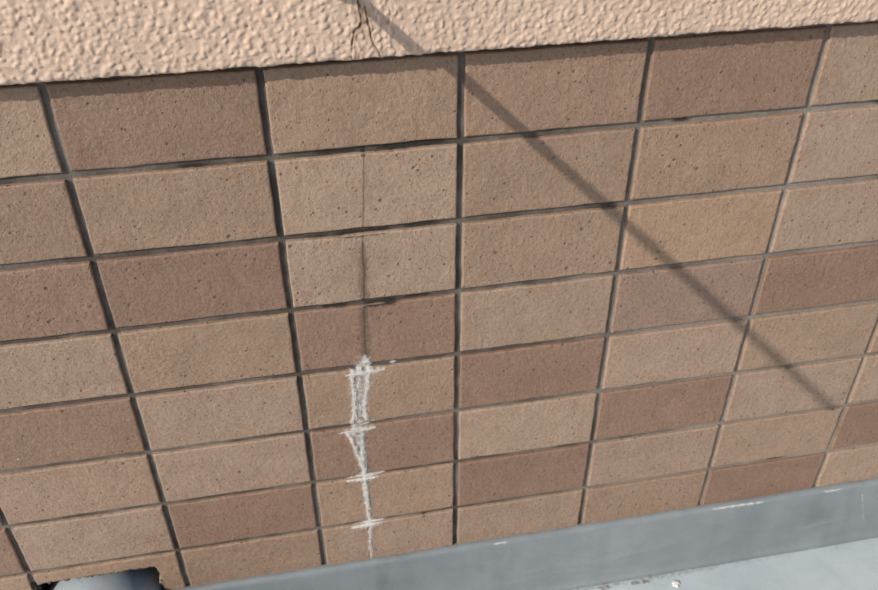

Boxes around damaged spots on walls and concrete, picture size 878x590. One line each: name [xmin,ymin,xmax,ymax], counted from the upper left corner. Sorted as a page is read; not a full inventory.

crack [341,0,382,60]